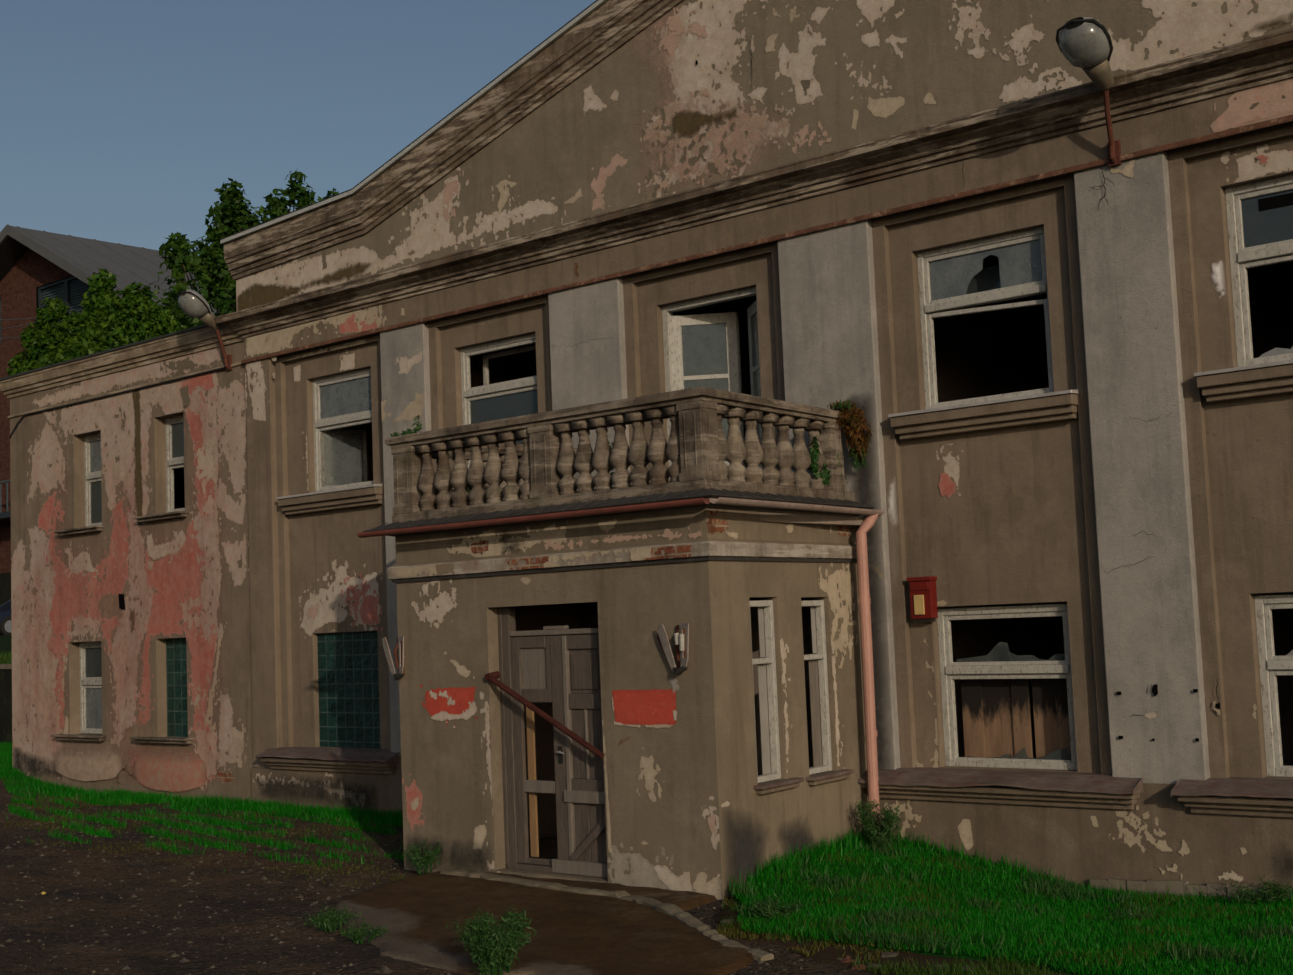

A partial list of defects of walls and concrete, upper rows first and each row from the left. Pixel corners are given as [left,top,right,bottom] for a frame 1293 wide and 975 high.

peeling [236,0,838,311]
peeling [835,0,907,130]
peeling [948,0,1082,103]
peeling [1097,0,1293,72]
peeling [1210,78,1293,132]
peeling [1221,144,1293,183]
peeling [936,443,963,498]
peeling [11,304,405,809]
peeling [298,509,738,638]
peeling [818,562,857,769]
spalling [602,689,722,900]
peeling [1090,805,1190,880]